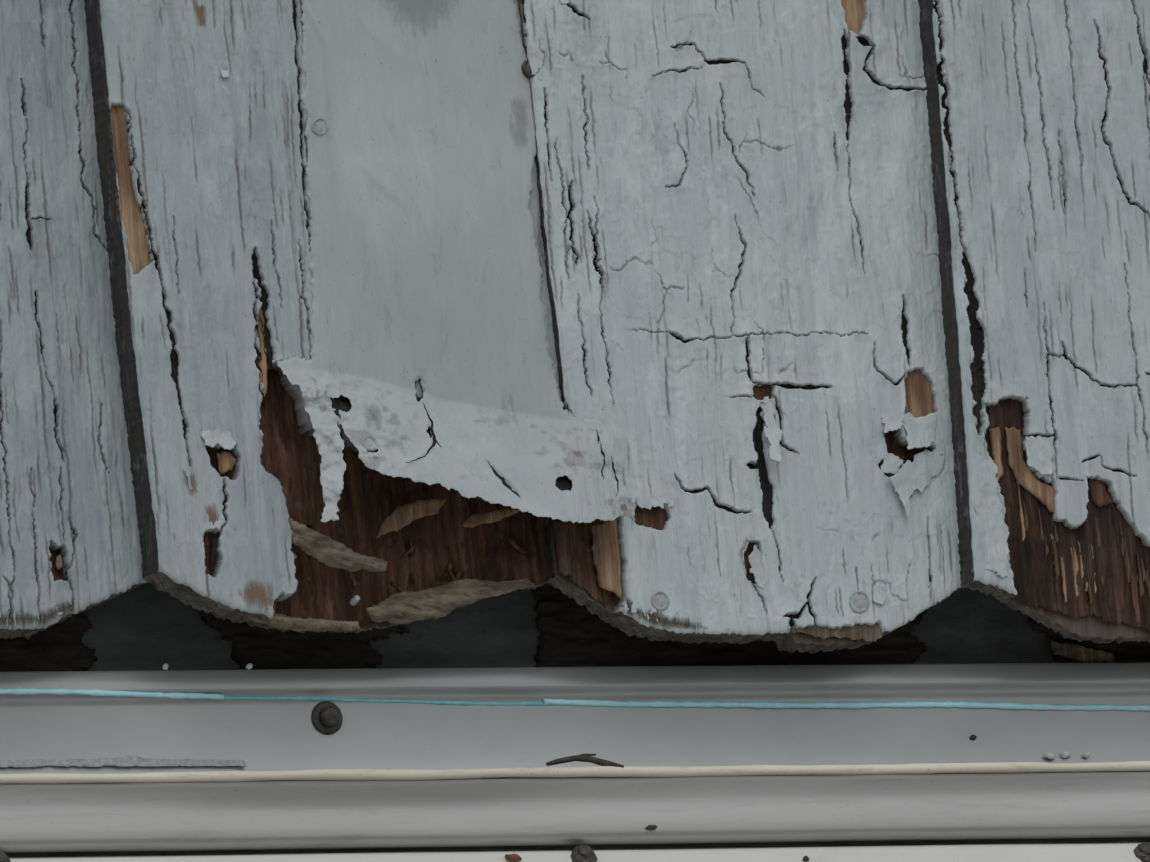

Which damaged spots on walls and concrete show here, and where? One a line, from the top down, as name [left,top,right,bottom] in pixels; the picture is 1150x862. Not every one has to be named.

peeling [110,105,153,275]
crack [127,128,189,462]
crack [251,0,309,398]
crack [551,186,602,288]
crack [833,0,985,435]
peeling [201,429,236,450]
peeling [634,493,674,530]
crack [684,328,828,571]
peeling [880,370,946,517]
peeling [974,458,1010,578]
peeling [1025,436,1055,475]
crack [783,583,815,630]